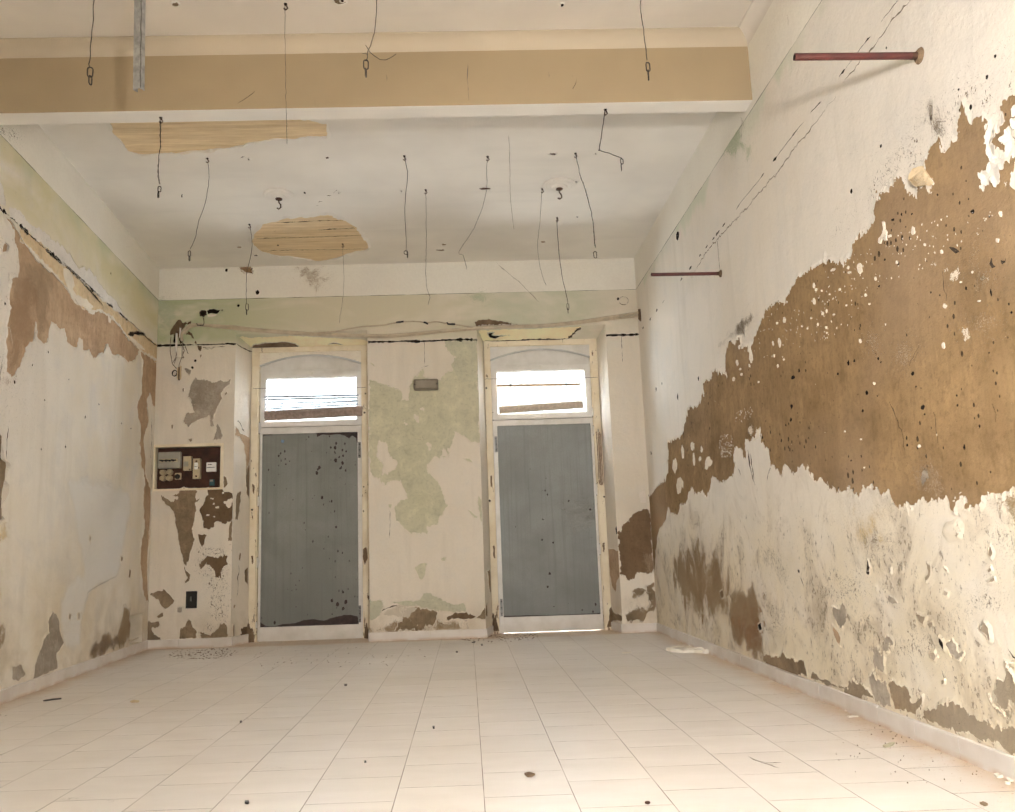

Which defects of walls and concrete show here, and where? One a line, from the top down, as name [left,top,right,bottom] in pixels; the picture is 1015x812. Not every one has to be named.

spalling [105,119,331,156]
crack [697,2,909,267]
peeling [0,205,581,640]
damp [673,534,785,659]
peeling [606,90,1015,624]
damp [982,495,1015,584]